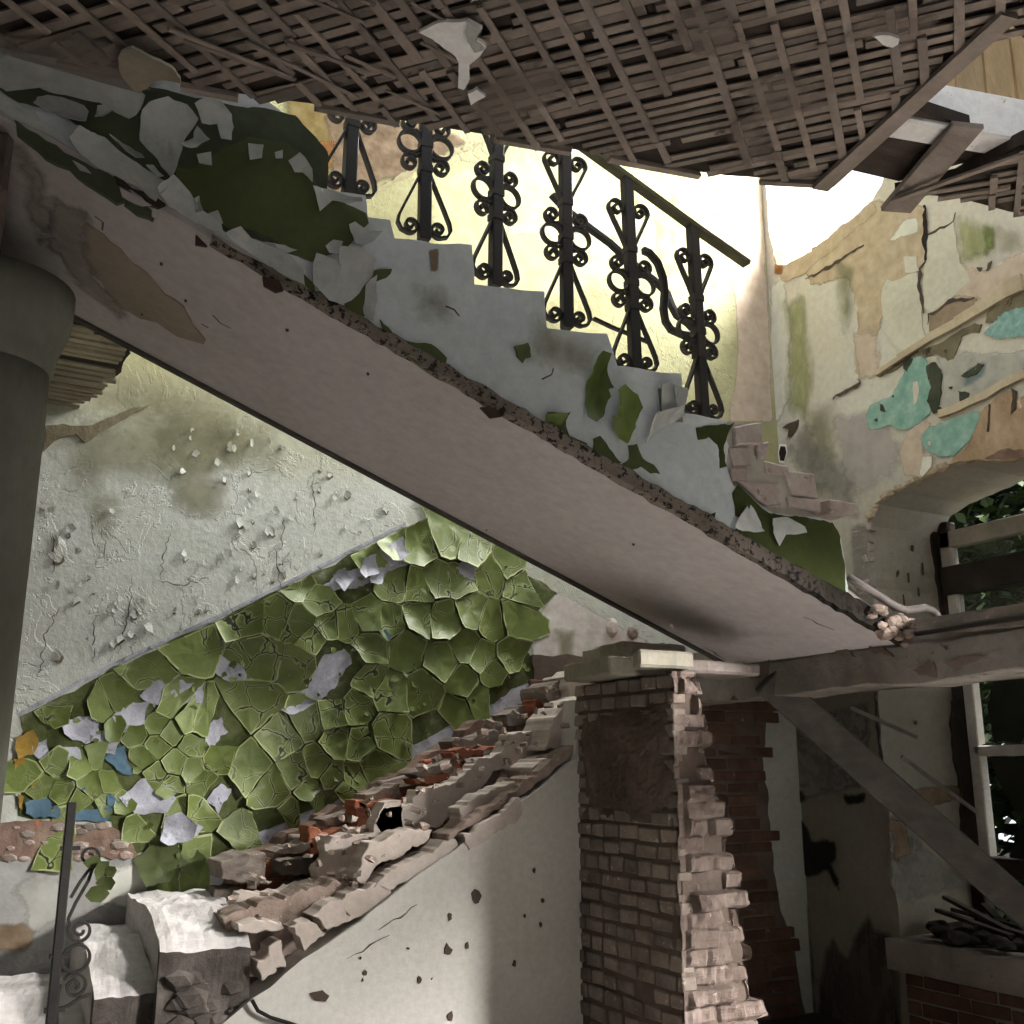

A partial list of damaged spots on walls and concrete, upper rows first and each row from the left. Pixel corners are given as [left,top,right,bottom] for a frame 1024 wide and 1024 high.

peeling [0,55,394,349]
flaking render [774,201,925,380]
crack [917,205,956,313]
leakage [81,390,258,510]
leakage [789,299,897,503]
leakage [926,362,970,414]
leakage [961,363,984,377]
crack [157,530,202,586]
crack [274,520,285,588]
crack [91,587,132,663]
peeling [0,496,647,904]
flaking render [671,671,806,1024]